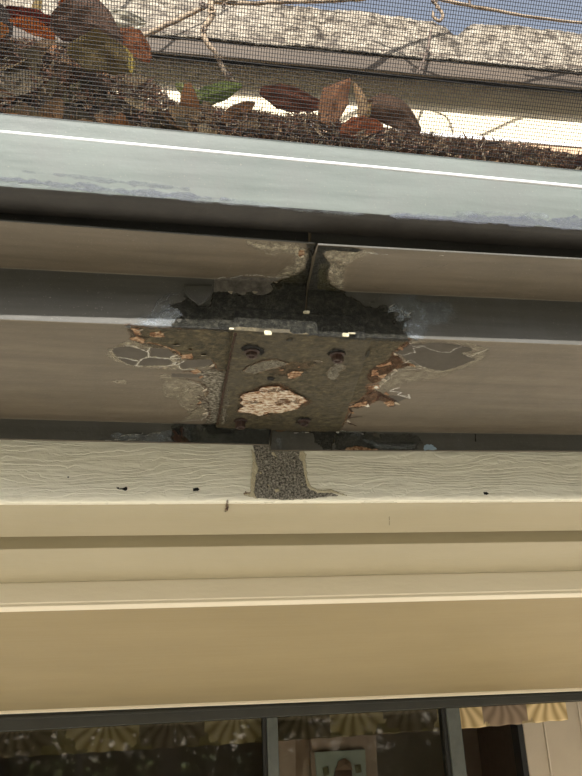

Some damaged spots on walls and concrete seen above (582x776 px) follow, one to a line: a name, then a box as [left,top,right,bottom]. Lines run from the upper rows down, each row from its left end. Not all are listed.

peeling [168,245,487,371]
peeling [108,340,213,378]
rust [126,325,237,425]
rust [239,359,304,415]
peeling [238,344,310,424]
peeling [315,349,346,380]
rust [342,338,415,427]